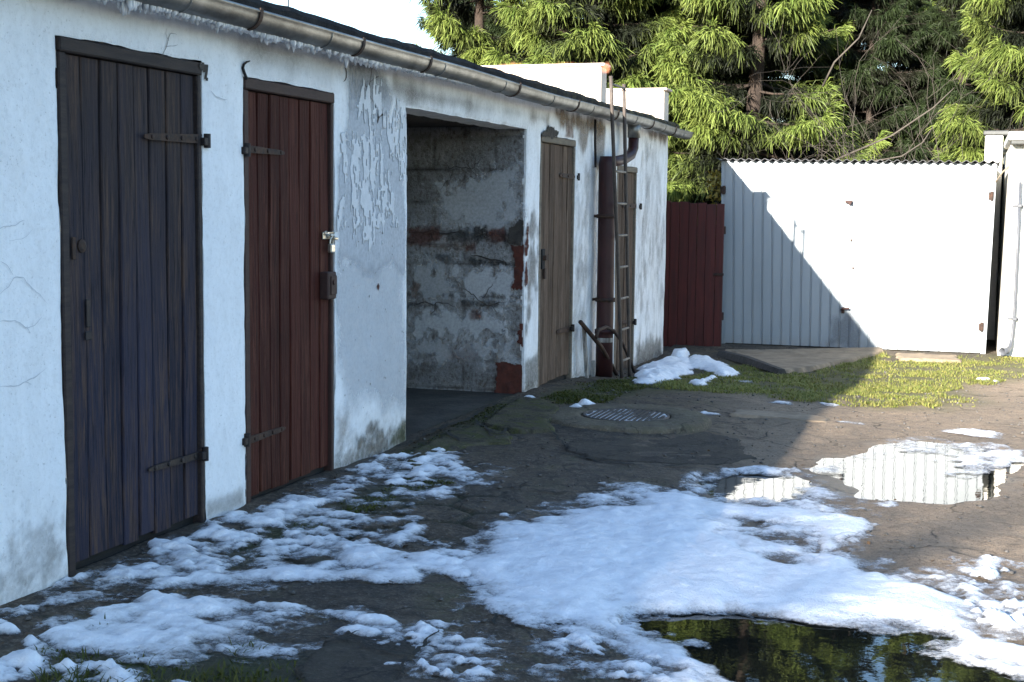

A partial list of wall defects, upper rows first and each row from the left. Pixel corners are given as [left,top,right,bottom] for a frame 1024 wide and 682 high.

crack [0,220,48,332]
peeling [337,64,536,401]
water stain [358,422,387,454]